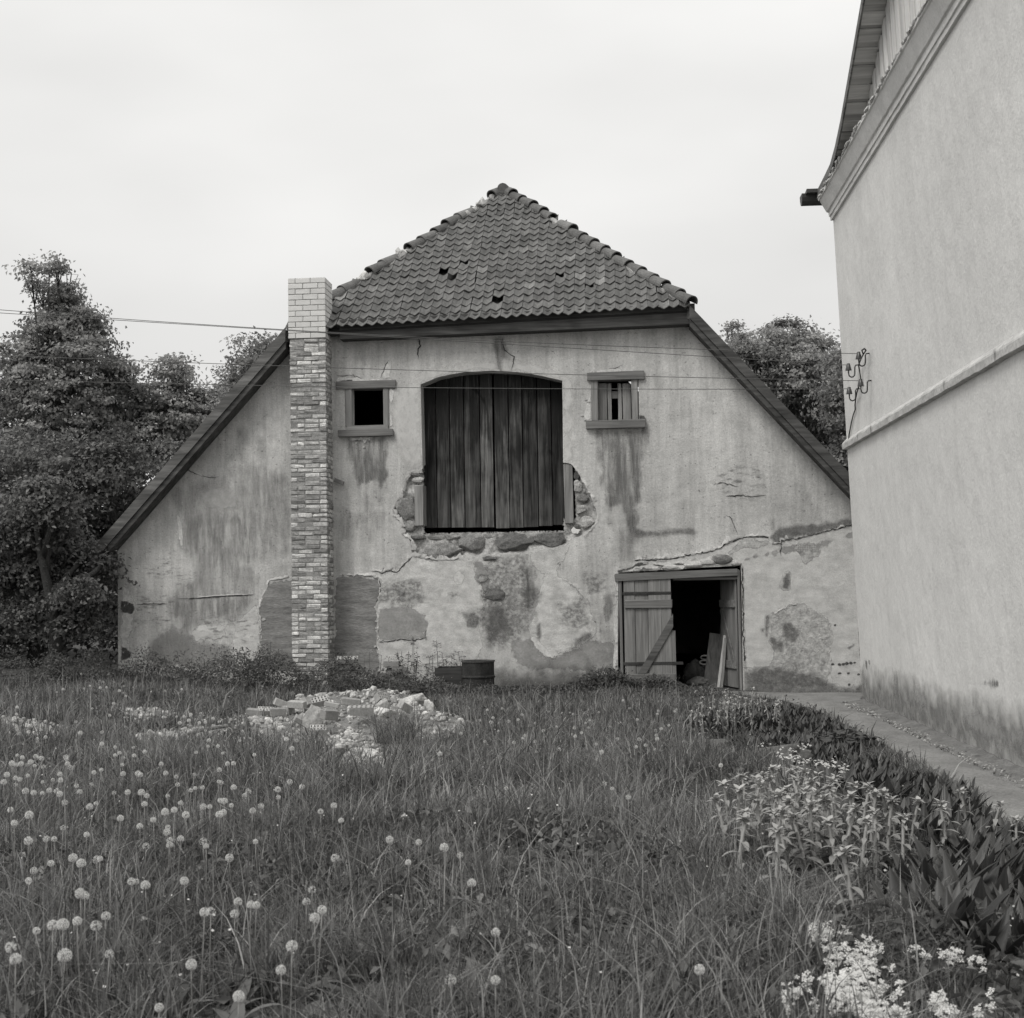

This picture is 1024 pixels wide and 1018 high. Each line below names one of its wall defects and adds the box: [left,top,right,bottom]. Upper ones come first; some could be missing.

water stain [349,438,387,484]
water stain [602,431,693,535]
crack [180,592,247,600]
peeling [192,575,292,666]
water stain [483,560,535,642]
peeling [336,463,862,690]